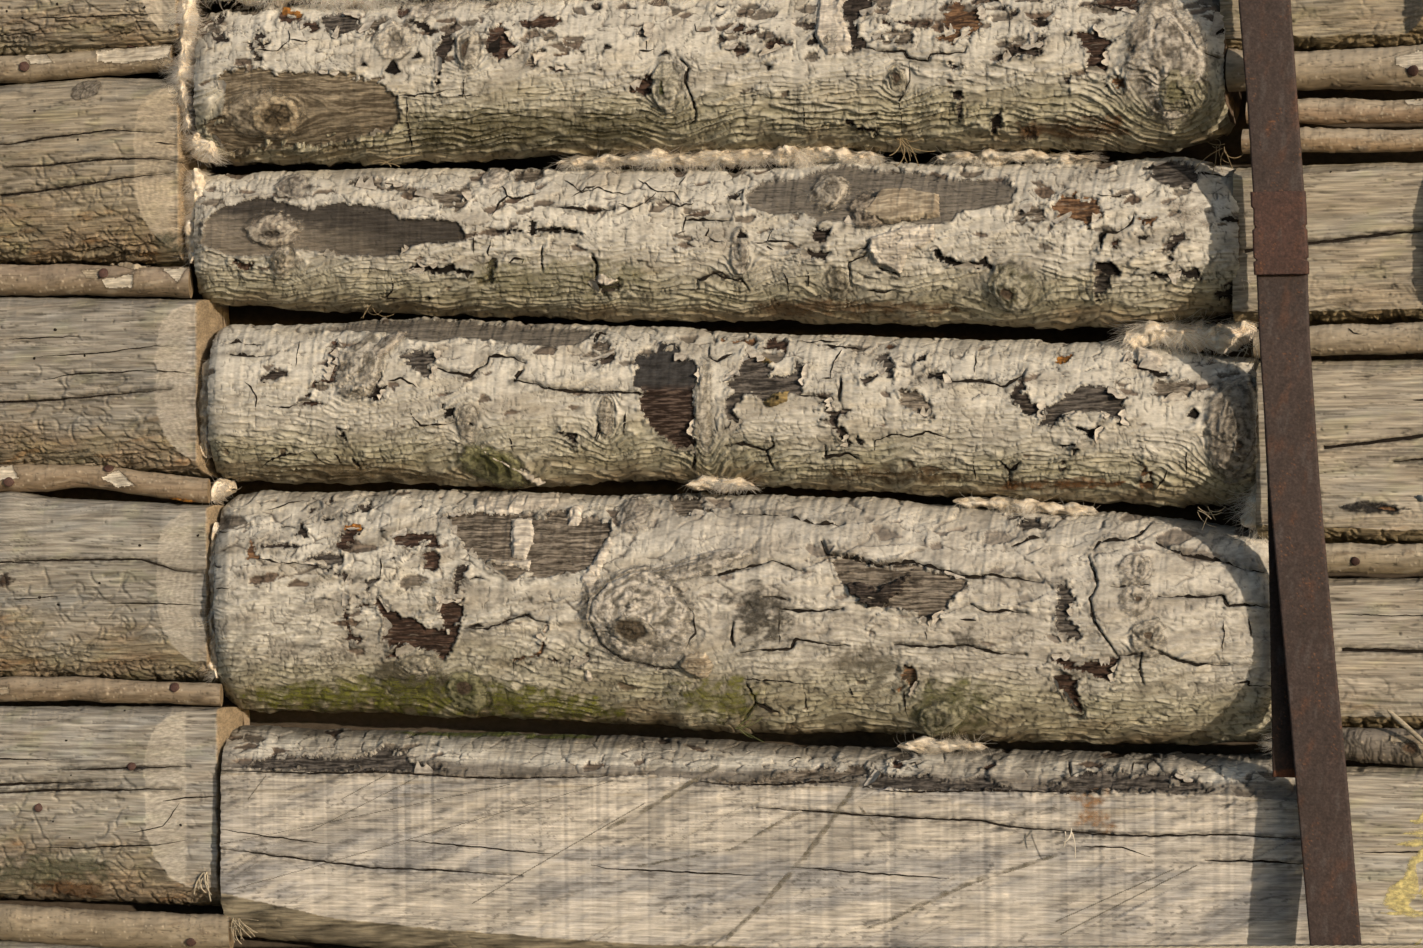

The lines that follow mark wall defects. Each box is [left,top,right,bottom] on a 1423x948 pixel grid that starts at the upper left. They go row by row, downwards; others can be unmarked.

peeling [204,4,457,157]
peeling [716,0,1019,71]
peeling [198,174,498,284]
peeling [728,164,1157,302]
peeling [296,318,617,409]
peeling [633,341,700,453]
peeling [721,337,809,431]
peeling [1010,376,1130,471]
crack [1324,399,1423,462]
peeling [247,443,612,660]
peeling [1051,584,1121,715]
crack [593,865,947,879]